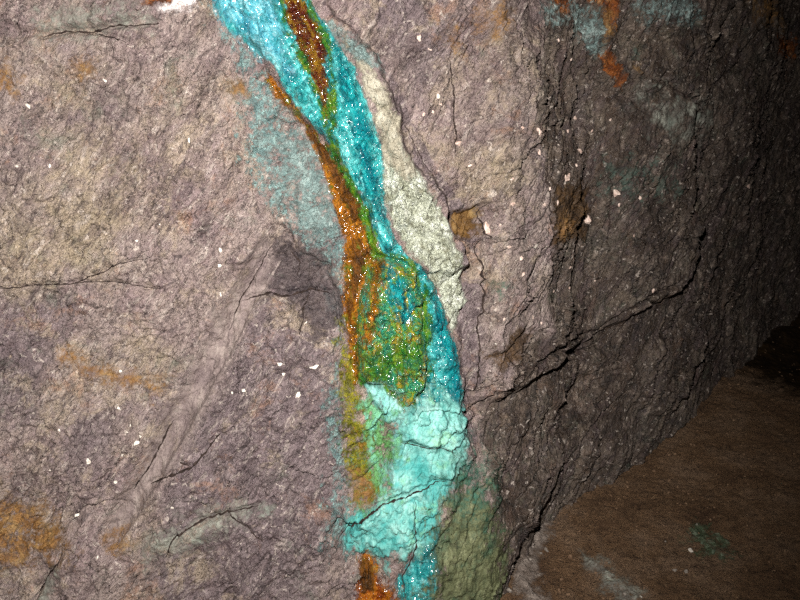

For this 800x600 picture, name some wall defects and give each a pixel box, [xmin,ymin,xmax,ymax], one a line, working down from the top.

crack [41,23,159,42]
corrosion [588,0,638,87]
corrosion [265,0,384,385]
corrosion [450,207,481,238]
crack [545,164,553,260]
crack [0,258,159,289]
leakage [213,0,513,600]
crack [466,204,502,429]
crack [516,283,676,379]
corrosion [356,550,406,600]